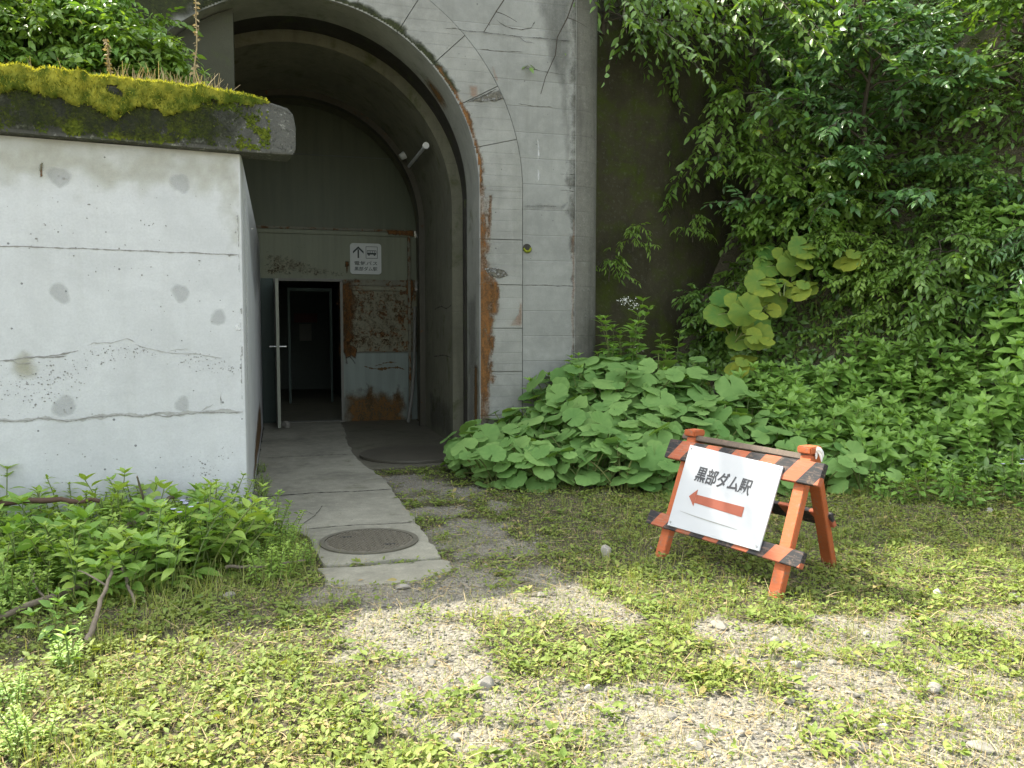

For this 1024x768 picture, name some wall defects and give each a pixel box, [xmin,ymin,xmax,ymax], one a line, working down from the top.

spalling [472,90,506,104]
corrosion [429,67,499,426]
crack [1,338,219,364]
crack [0,396,242,422]
corrosion [346,388,405,421]